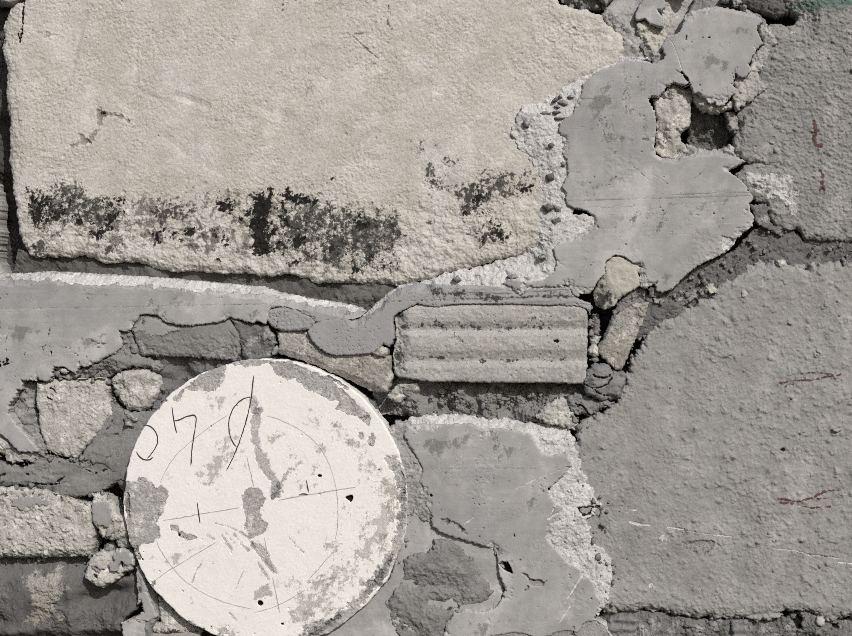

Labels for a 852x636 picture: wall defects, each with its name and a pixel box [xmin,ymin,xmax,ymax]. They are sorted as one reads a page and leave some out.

crack [4,2,25,43]
peeling [635,0,666,29]
spalling [720,0,747,12]
leakage [24,179,407,281]
spalling [3,54,648,319]
leakage [424,154,537,248]
spalling [721,236,732,253]
spalling [139,339,179,356]
peeling [155,344,376,446]
spalling [298,413,612,636]